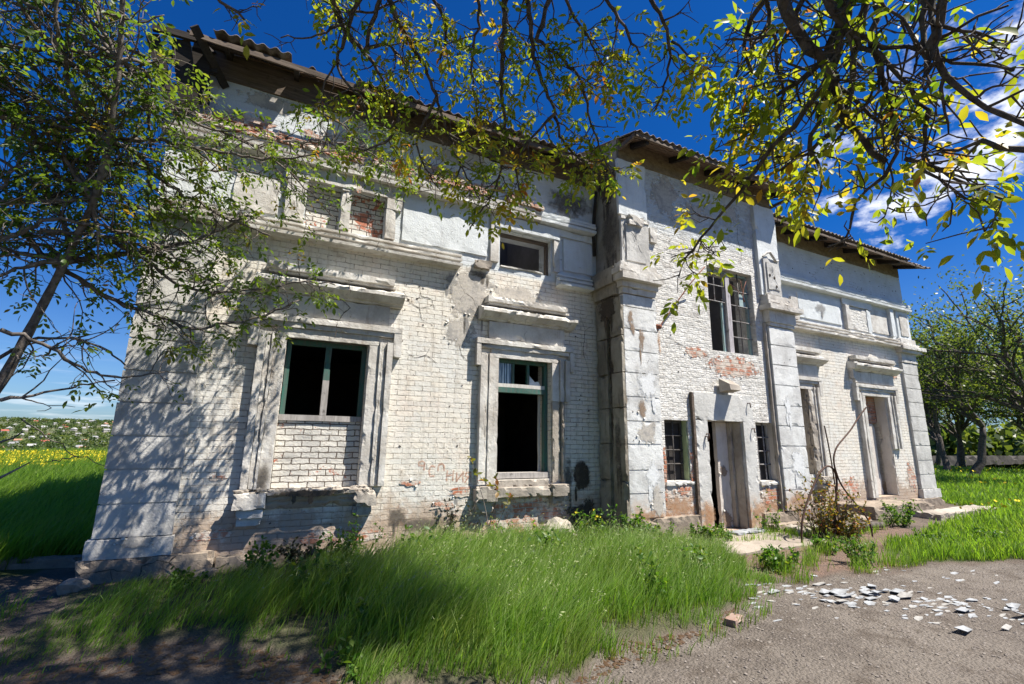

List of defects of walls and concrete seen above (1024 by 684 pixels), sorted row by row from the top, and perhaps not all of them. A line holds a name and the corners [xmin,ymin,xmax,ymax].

flaking render [681,345,762,378]
water stain [565,460,599,528]
flaking render [673,485,692,496]
flaking render [761,485,779,504]